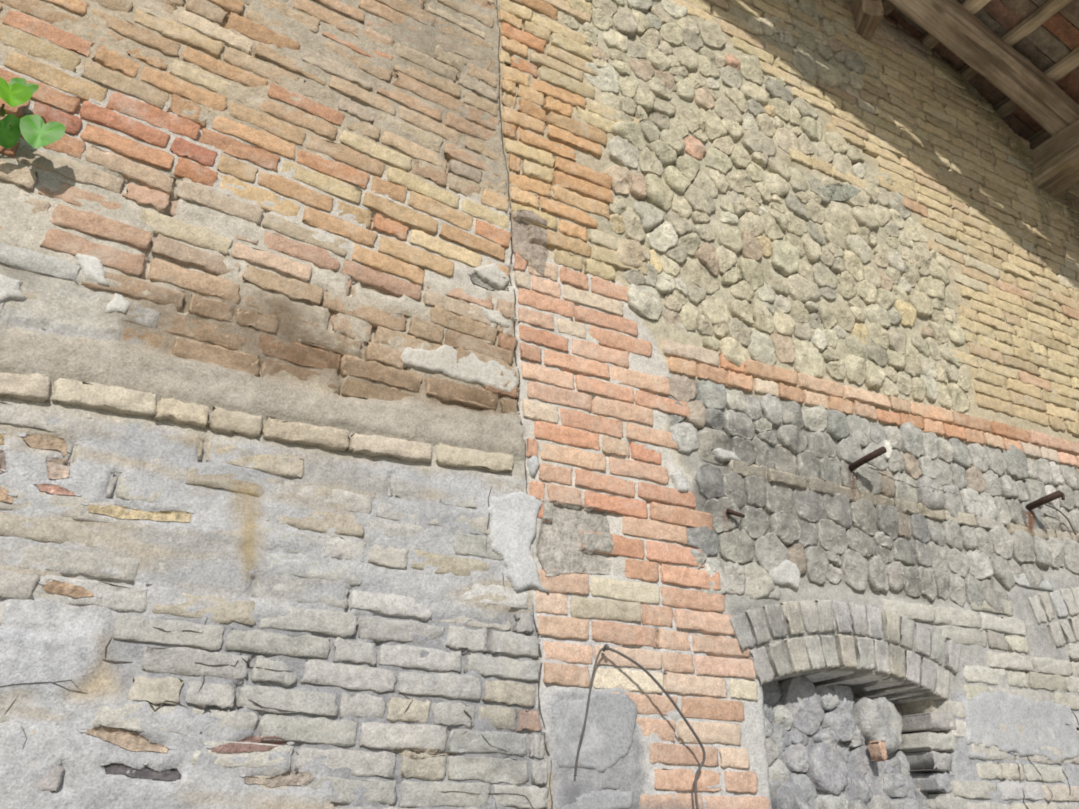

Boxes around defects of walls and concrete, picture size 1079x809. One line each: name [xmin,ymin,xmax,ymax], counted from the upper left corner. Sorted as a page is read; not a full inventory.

flaking render [467,263,510,291]
flaking render [479,306,509,328]
crack [496,0,527,492]
flaking render [401,345,519,393]
spalling [488,492,615,595]
crack [441,609,553,809]